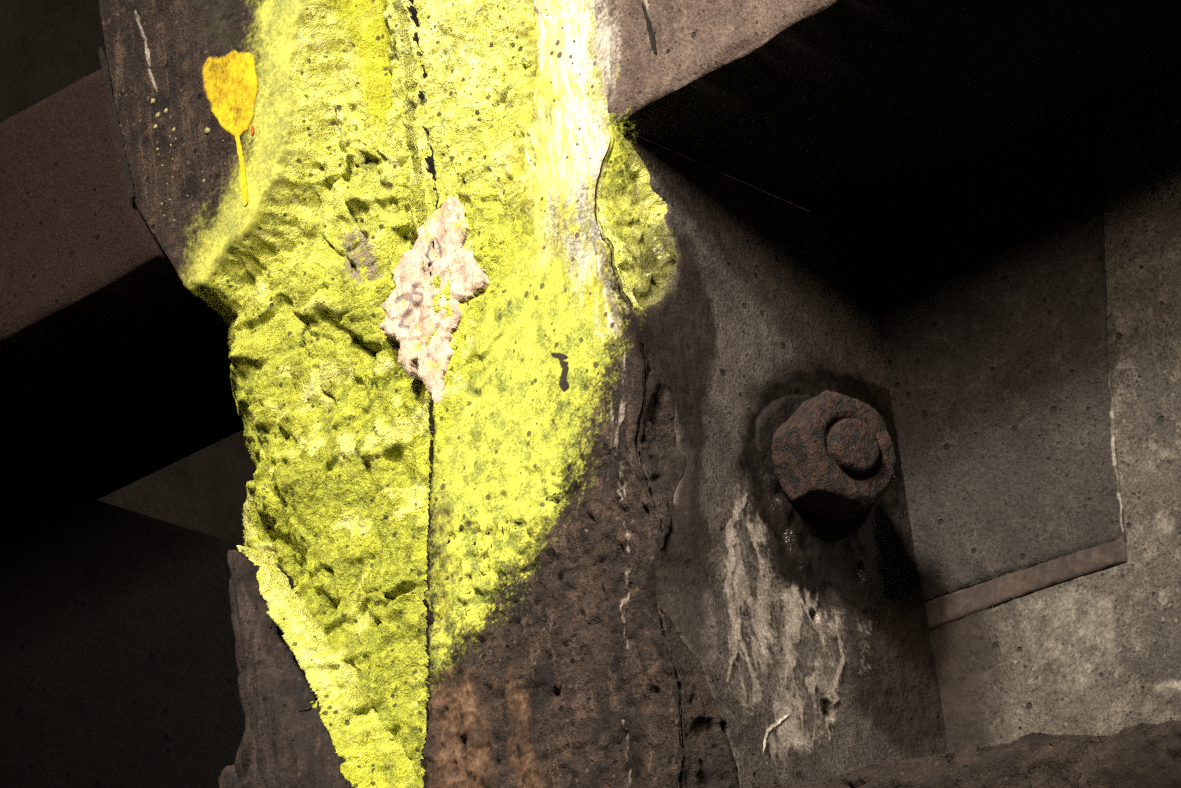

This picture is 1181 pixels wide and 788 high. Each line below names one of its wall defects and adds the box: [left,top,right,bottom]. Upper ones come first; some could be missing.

spalling [187,0,537,788]
crack [420,393,435,787]
efflorescence [720,486,845,765]